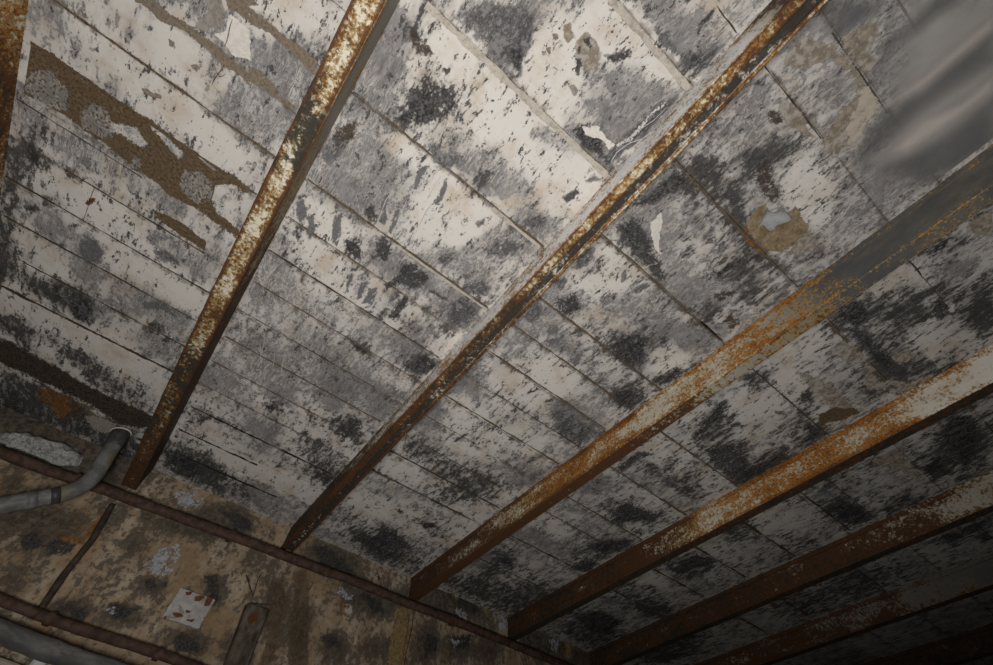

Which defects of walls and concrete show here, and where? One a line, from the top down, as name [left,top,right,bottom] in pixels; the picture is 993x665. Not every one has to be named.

peeling [24,42,249,238]
damp [393,54,458,126]
damp [413,144,465,205]
damp [459,0,533,76]
peeling [582,125,615,150]
damp [607,49,630,64]
damp [573,98,677,164]
damp [862,19,993,173]
peeling [153,211,206,250]
damp [331,194,490,326]
damp [616,170,688,293]
flaking render [743,204,809,252]